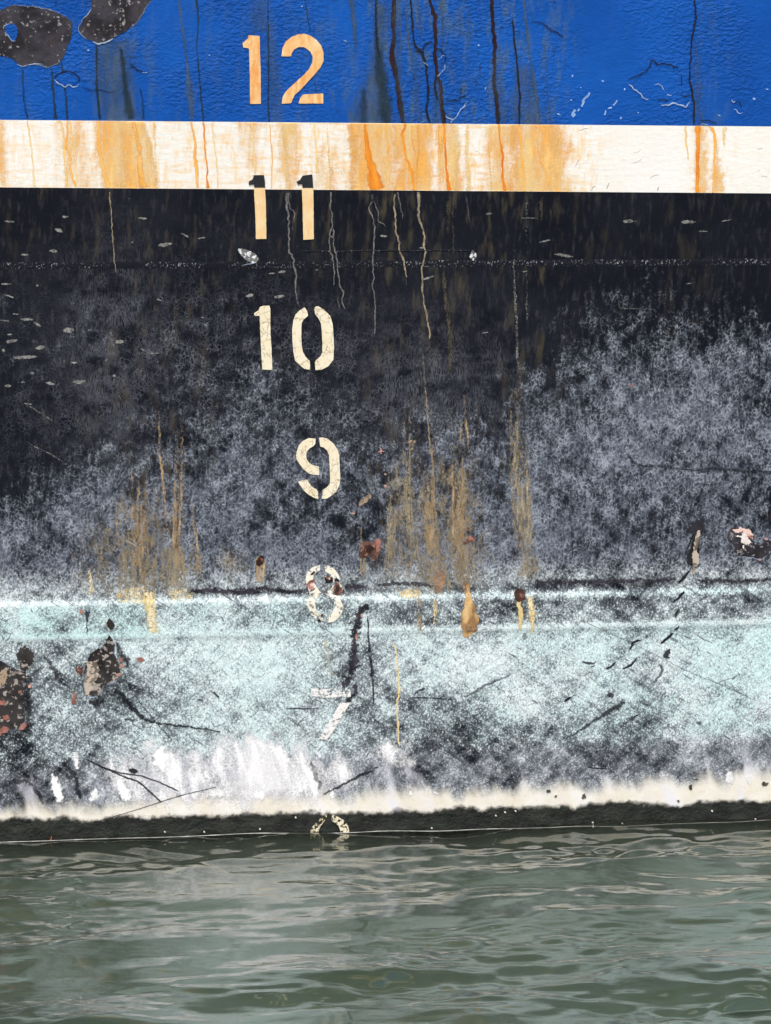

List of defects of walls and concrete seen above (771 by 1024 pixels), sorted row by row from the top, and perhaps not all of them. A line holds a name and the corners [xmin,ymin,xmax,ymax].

peeling [0,0,151,68]
rust [22,70,36,186]
rust [51,63,87,187]
rust [96,121,157,188]
rust [347,123,470,214]
rust [87,426,202,633]
rust [359,437,480,638]
rust [509,411,539,633]
peeling [726,527,771,561]
peeling [0,646,35,736]
peeling [71,618,145,708]